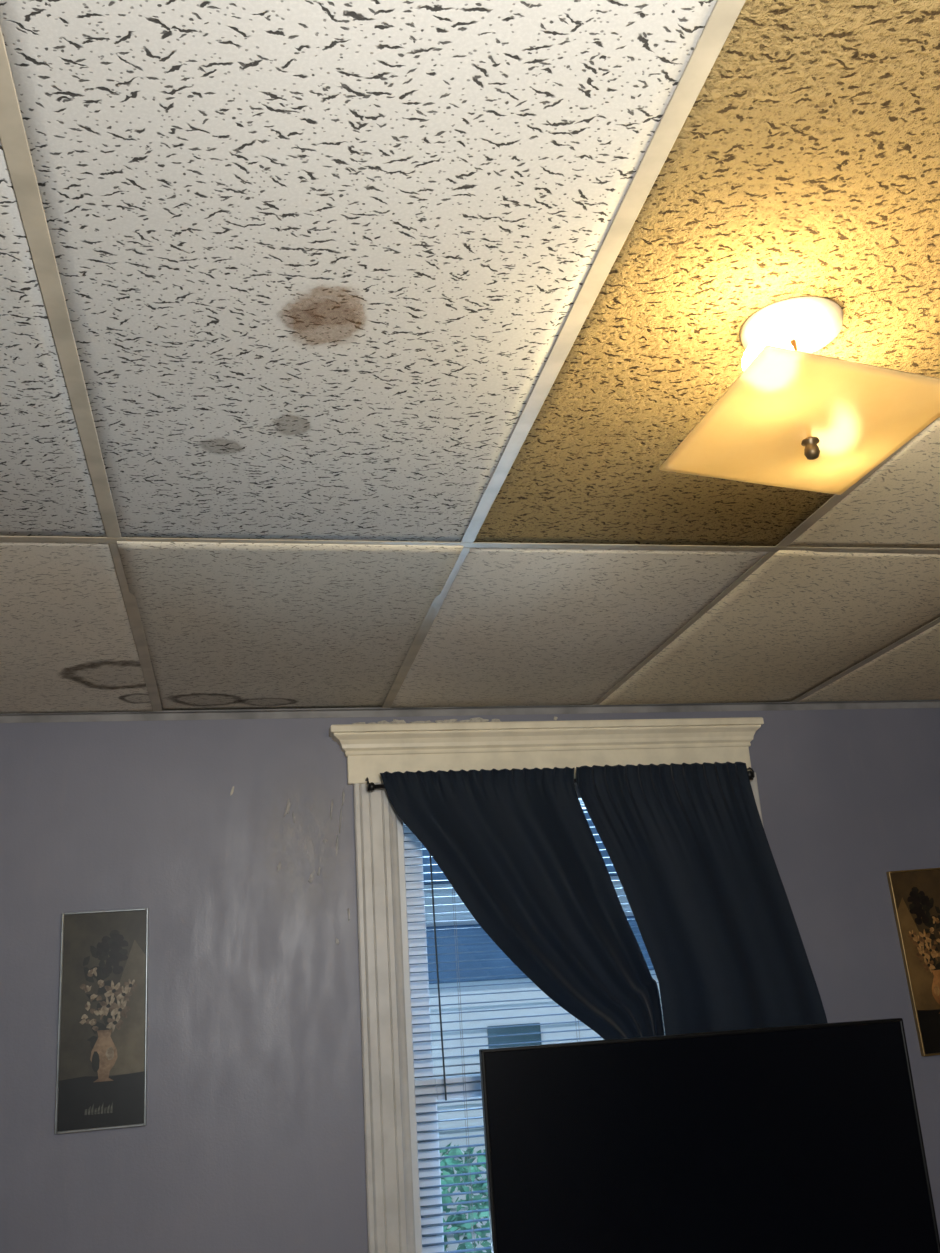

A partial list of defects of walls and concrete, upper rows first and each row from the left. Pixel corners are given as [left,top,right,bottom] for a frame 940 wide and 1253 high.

water stain [65,661,146,703]